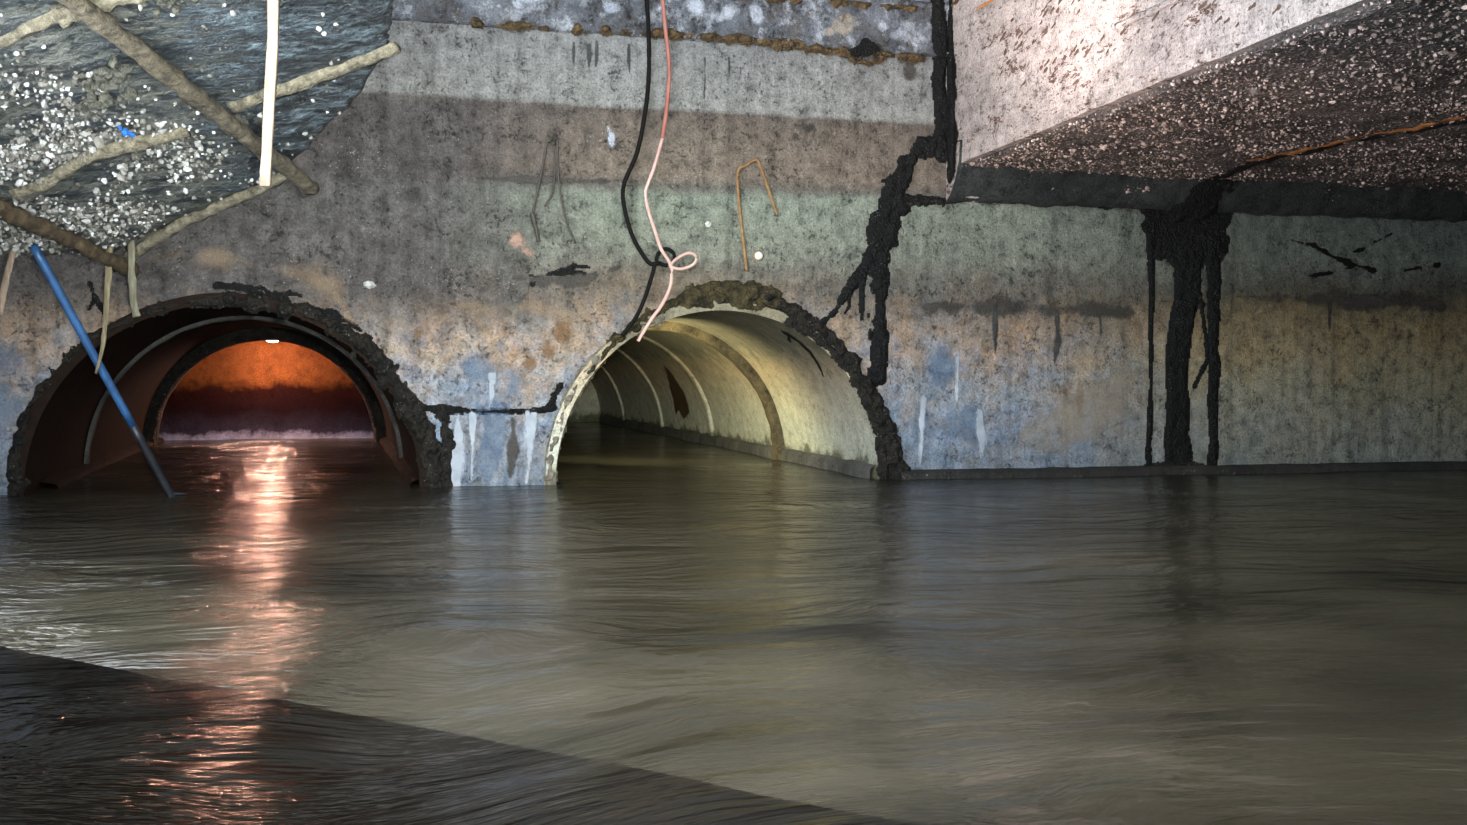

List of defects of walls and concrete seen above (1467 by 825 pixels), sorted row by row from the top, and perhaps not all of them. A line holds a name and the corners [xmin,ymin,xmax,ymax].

corrosion [469,17,550,32]
corrosion [571,23,925,64]
crack [903,0,959,208]
damp [918,179,1446,467]
damp [451,359,537,486]
crack [425,382,564,487]